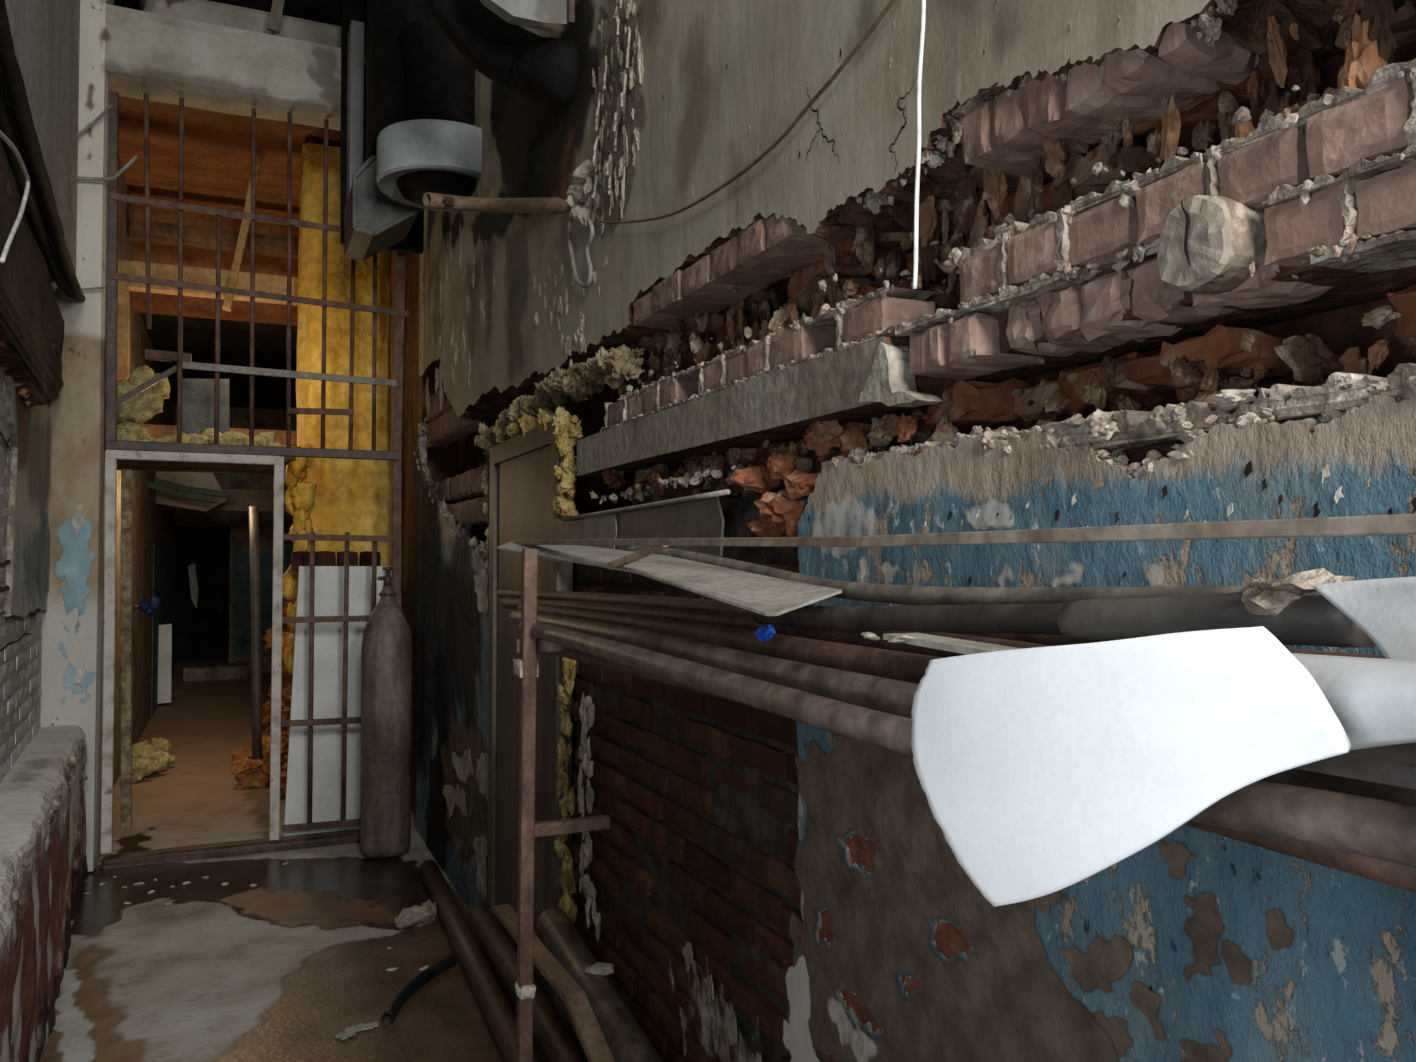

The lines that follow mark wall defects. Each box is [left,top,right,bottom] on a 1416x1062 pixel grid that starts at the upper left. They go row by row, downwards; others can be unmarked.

spalling [0,340,34,470]
spalling [414,386,490,616]
peeling [533,253,607,377]
spalling [590,0,1416,587]
crack [0,560,40,652]
peeling [25,504,96,702]
water stain [0,731,505,1062]
peeling [425,706,488,901]
peeling [789,734,1232,1062]
peeling [1183,892,1251,985]
peeling [1266,909,1294,950]